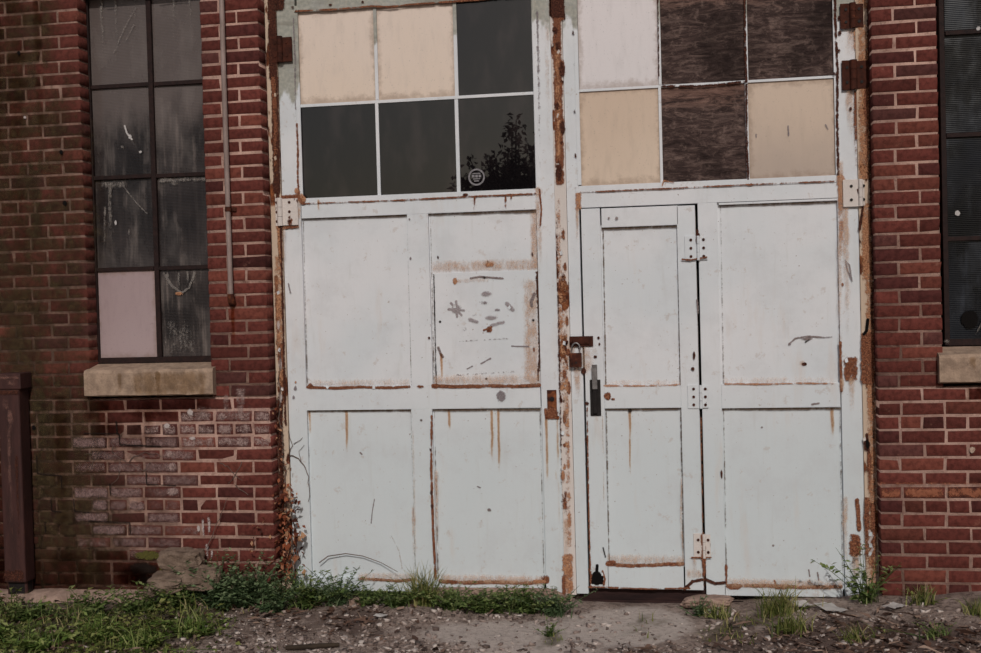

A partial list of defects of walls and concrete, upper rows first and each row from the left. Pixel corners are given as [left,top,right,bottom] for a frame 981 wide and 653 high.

rust [536,0,576,185]
damp [0,0,83,481]
damp [74,390,268,586]
rust [274,216,299,578]
rust [267,0,542,390]
peeling [428,274,444,384]
peeling [447,292,514,340]
rust [429,415,550,585]
rust [544,407,567,424]
rust [562,554,574,595]
rust [575,0,878,591]